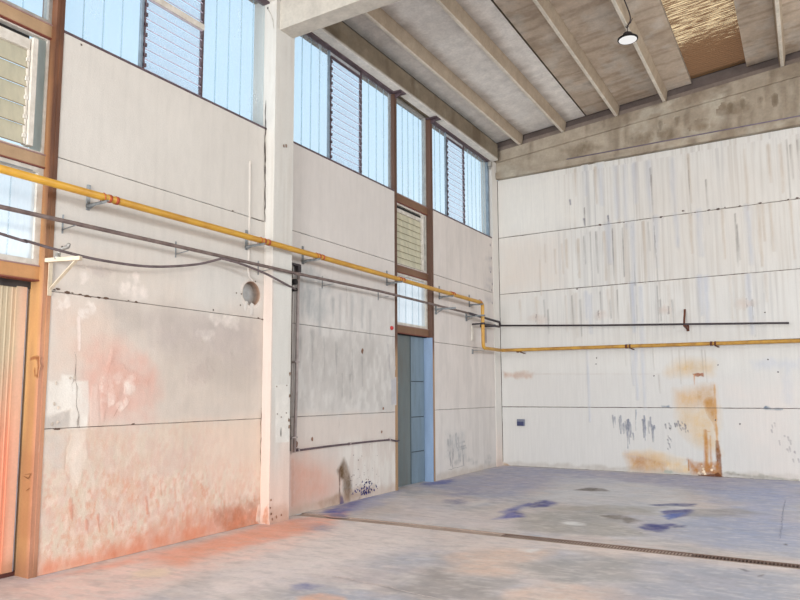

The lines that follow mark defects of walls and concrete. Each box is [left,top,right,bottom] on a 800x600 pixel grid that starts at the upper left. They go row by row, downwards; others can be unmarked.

rust [621,355,726,477]
water stain [126,456,410,581]